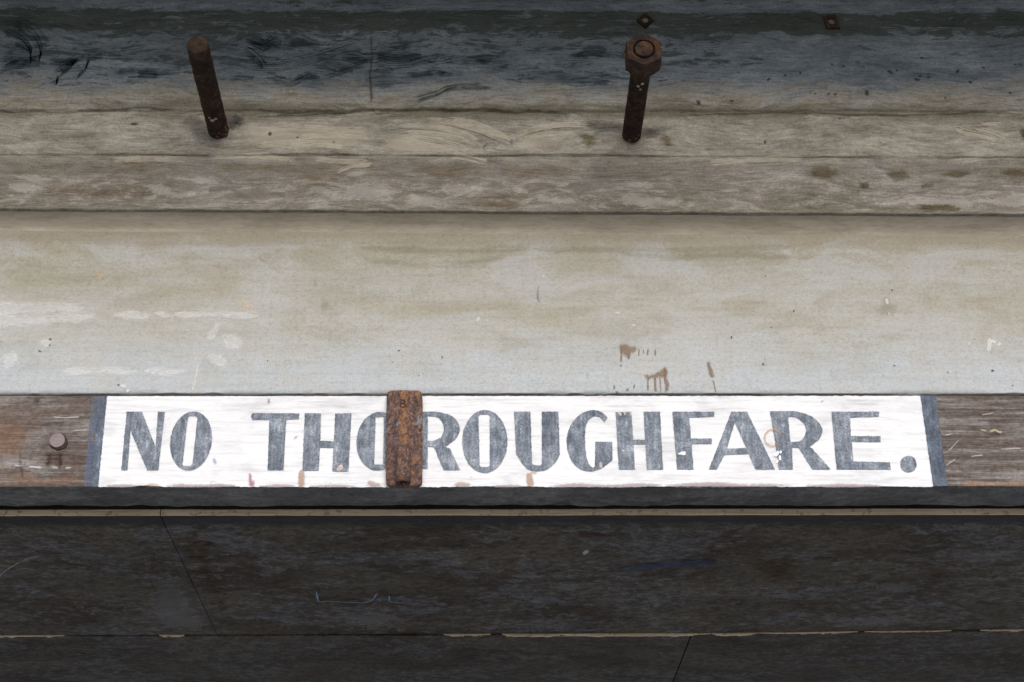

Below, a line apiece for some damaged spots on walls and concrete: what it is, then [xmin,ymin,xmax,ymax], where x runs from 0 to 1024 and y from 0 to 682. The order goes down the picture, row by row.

corrosion [620,345,656,366]
corrosion [614,368,669,393]